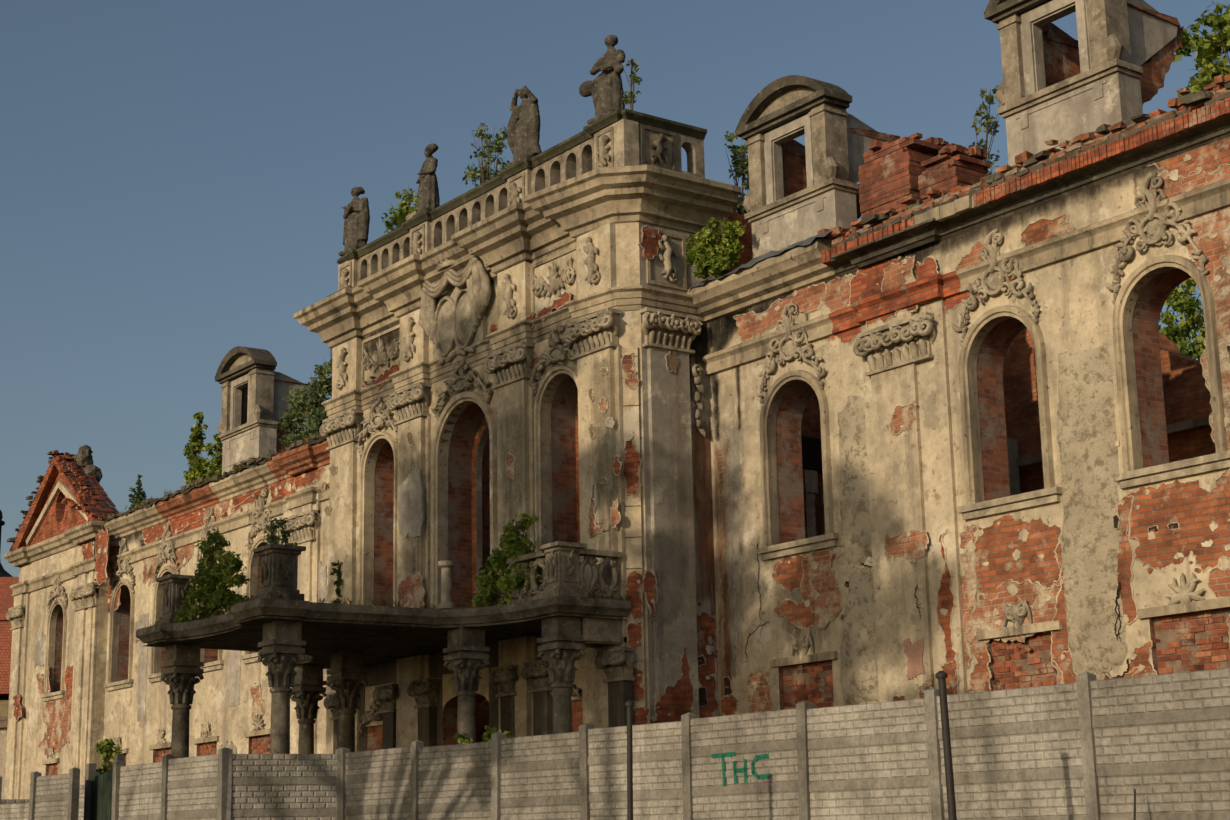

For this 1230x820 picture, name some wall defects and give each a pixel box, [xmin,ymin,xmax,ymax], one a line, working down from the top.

flaking render [1134,136,1230,205]
flaking render [638,225,663,260]
flaking render [1020,213,1075,247]
flaking render [733,255,939,344]
flaking render [1184,206,1230,450]
flaking render [588,436,642,538]
flaking render [81,526,122,613]
flaking render [771,547,849,629]
flaking render [884,514,1078,701]
flaking render [1111,468,1230,625]
flaking render [632,602,775,725]
flaking render [36,665,73,756]